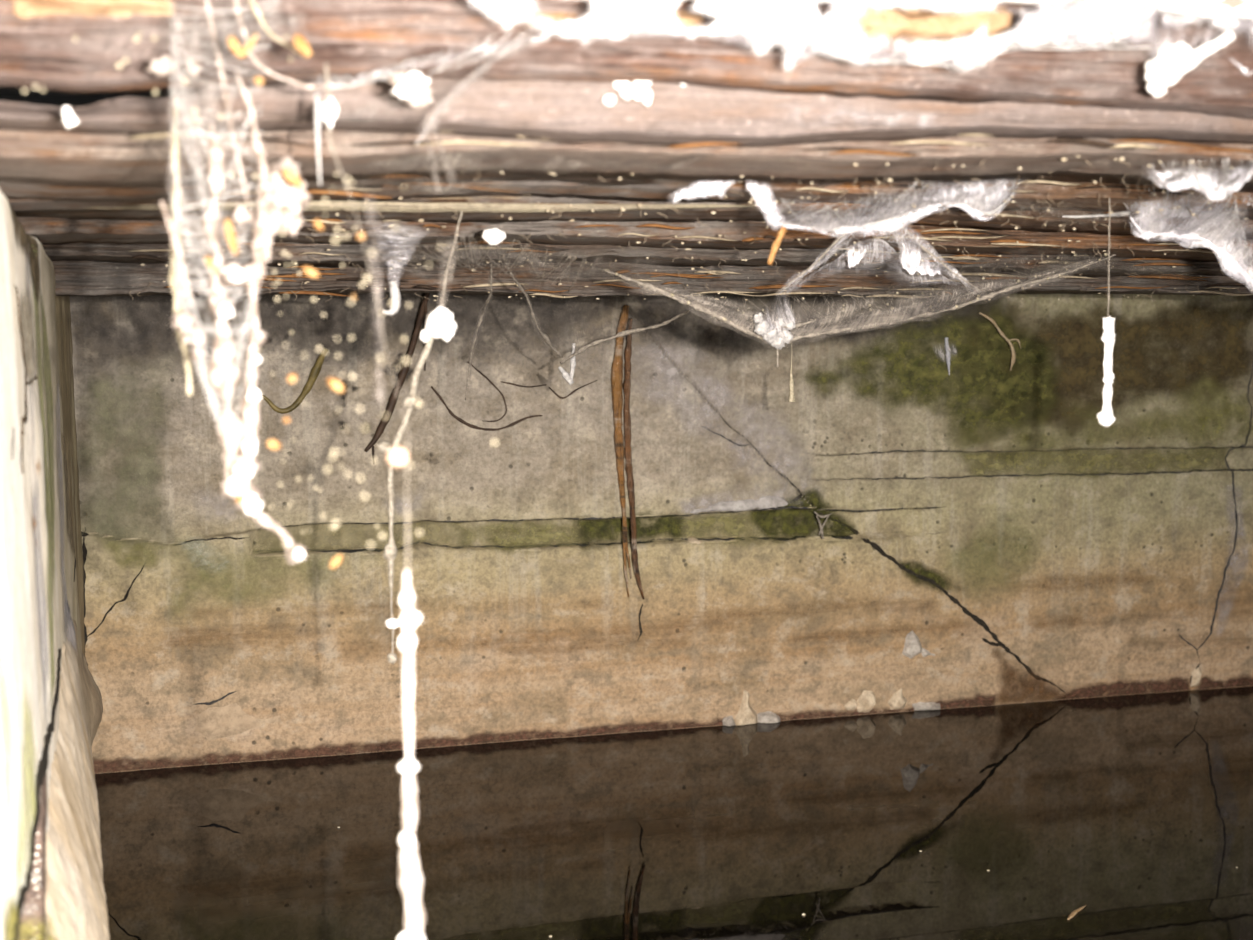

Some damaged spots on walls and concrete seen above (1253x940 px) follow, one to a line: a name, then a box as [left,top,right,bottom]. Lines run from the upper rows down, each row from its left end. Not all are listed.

crack [12,285,38,473]
damp [642,293,1253,433]
damp [260,532,286,550]
damp [303,521,581,551]
damp [678,483,855,544]
crack [681,373,1067,694]
crack [1178,364,1253,687]
crack [14,527,145,940]
damp [93,688,995,773]
damp [1057,667,1253,700]